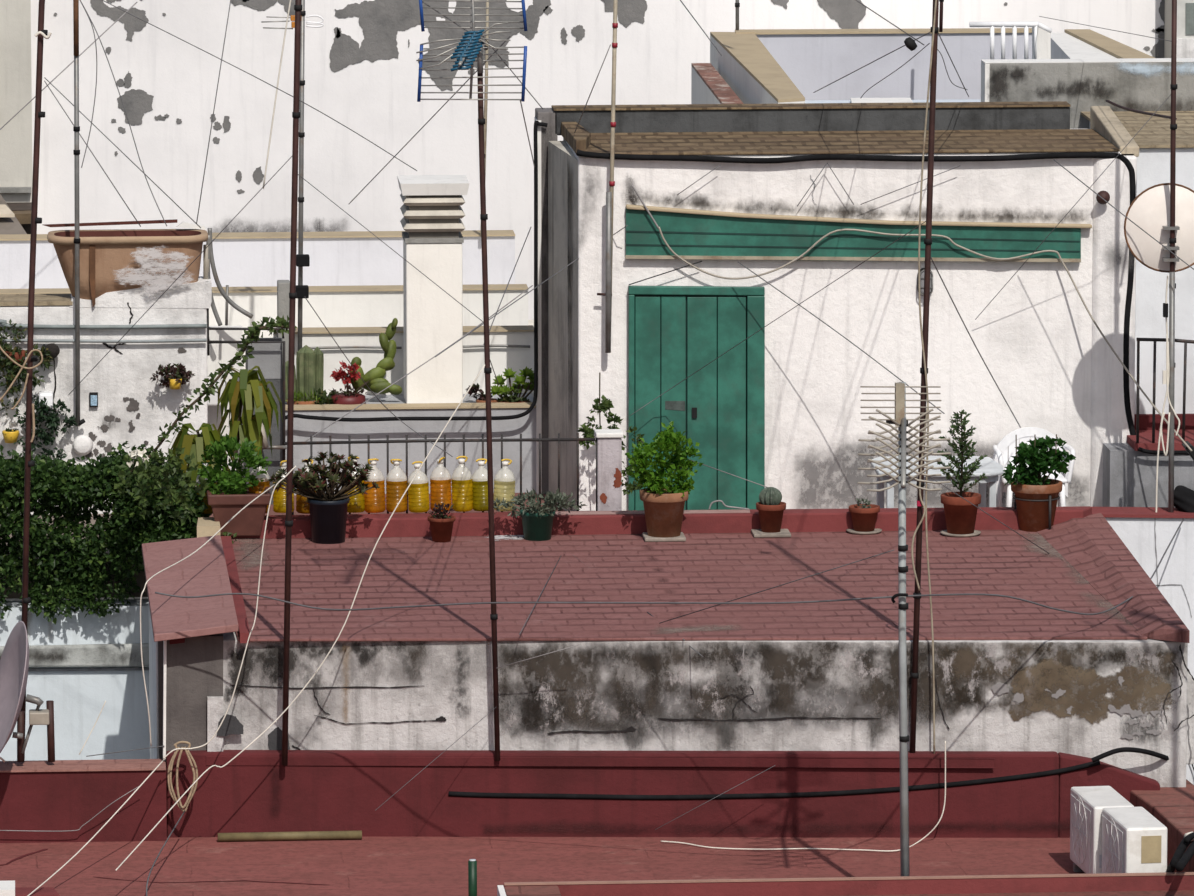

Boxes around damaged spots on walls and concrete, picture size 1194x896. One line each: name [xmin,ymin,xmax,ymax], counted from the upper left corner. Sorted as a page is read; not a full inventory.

peeling [90,0,149,41]
peeling [231,0,295,16]
peeling [329,0,552,91]
peeling [561,25,585,45]
peeling [601,0,647,28]
peeling [817,0,866,29]
peeling [111,71,182,133]
leakage [990,68,1024,100]
leakage [1037,79,1148,112]
peeling [115,246,193,299]
leakage [498,641,1180,747]
peeling [991,658,1174,740]